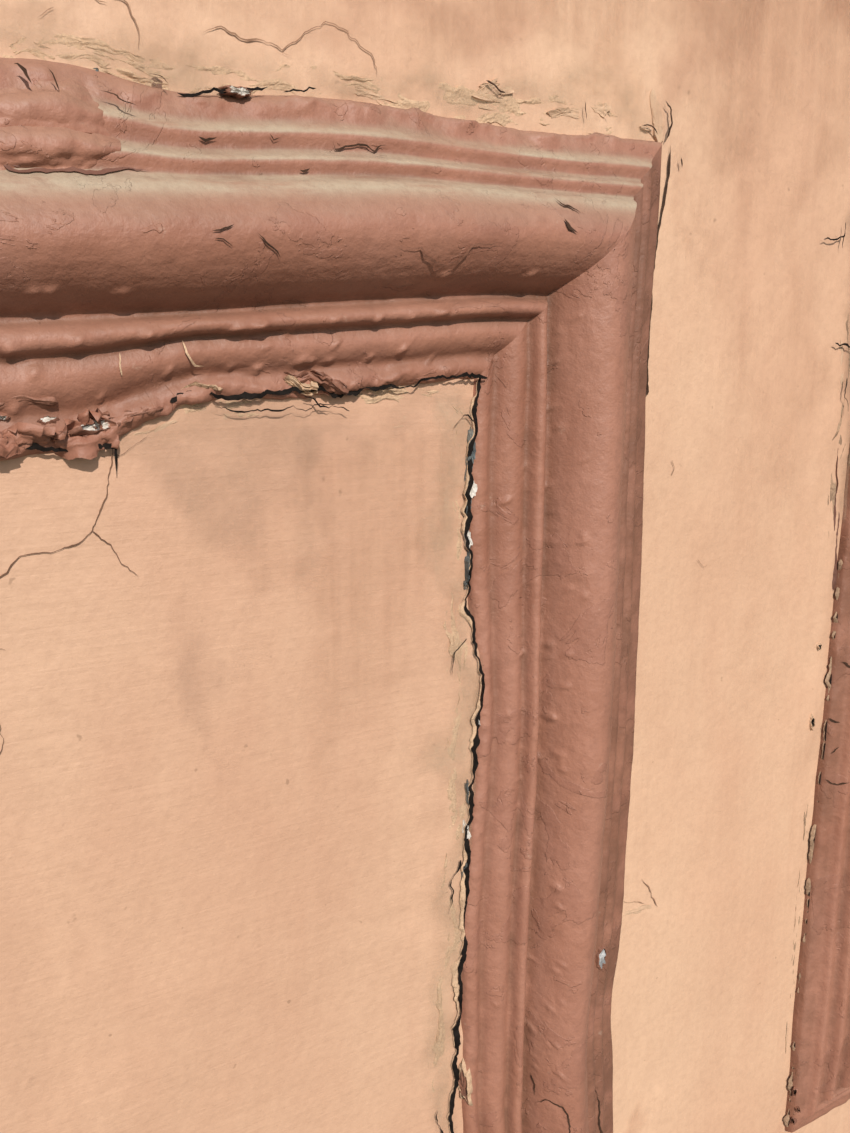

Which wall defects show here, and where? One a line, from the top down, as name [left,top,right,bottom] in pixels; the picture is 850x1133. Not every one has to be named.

peeling [89,60,170,91]
peeling [217,85,252,99]
flaking render [546,103,612,119]
peeling [283,369,439,404]
spalling [0,381,261,460]
crack [0,438,145,578]
flaking render [428,378,482,1133]